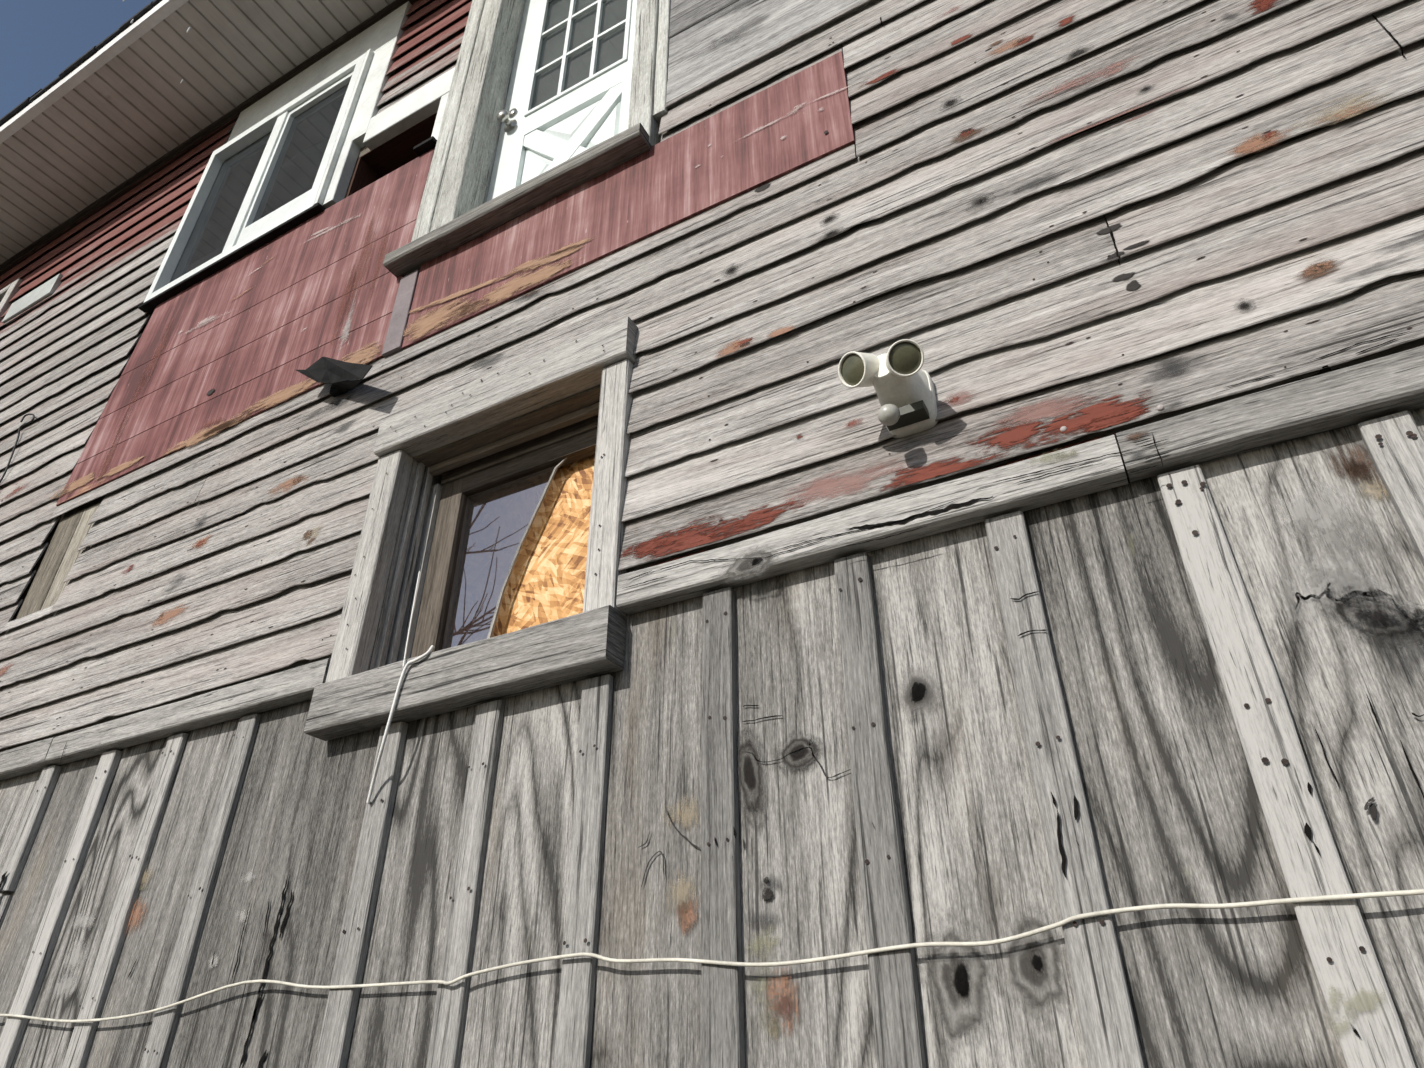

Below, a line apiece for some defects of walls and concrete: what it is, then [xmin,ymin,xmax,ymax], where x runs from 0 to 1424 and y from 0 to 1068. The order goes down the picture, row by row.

peeling [408,238,589,314]
peeling [341,341,381,364]
peeling [203,378,321,437]
peeling [878,389,1152,492]
peeling [50,455,144,499]
peeling [619,500,804,568]
crack [622,433,1169,589]
crack [1295,583,1423,622]